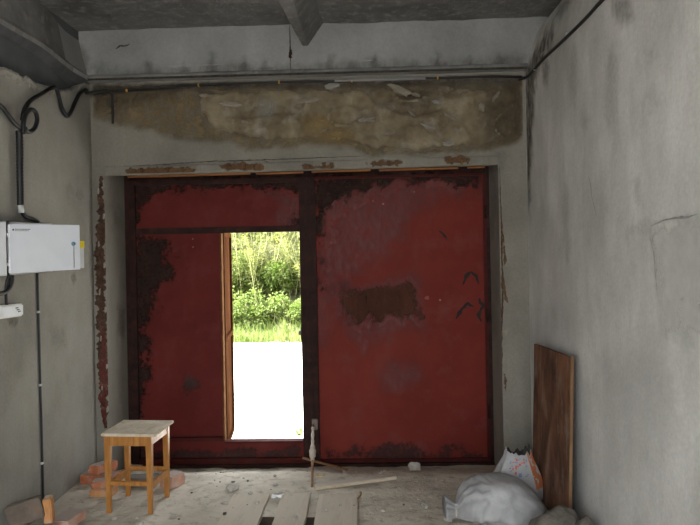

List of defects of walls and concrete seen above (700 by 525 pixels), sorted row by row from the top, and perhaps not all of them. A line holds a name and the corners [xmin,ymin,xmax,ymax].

damp [94,31,553,180]
spalling [199,83,520,151]
spalling [93,176,109,429]
corrosion [136,235,176,417]
corrosion [126,155,481,350]
crack [649,214,697,296]